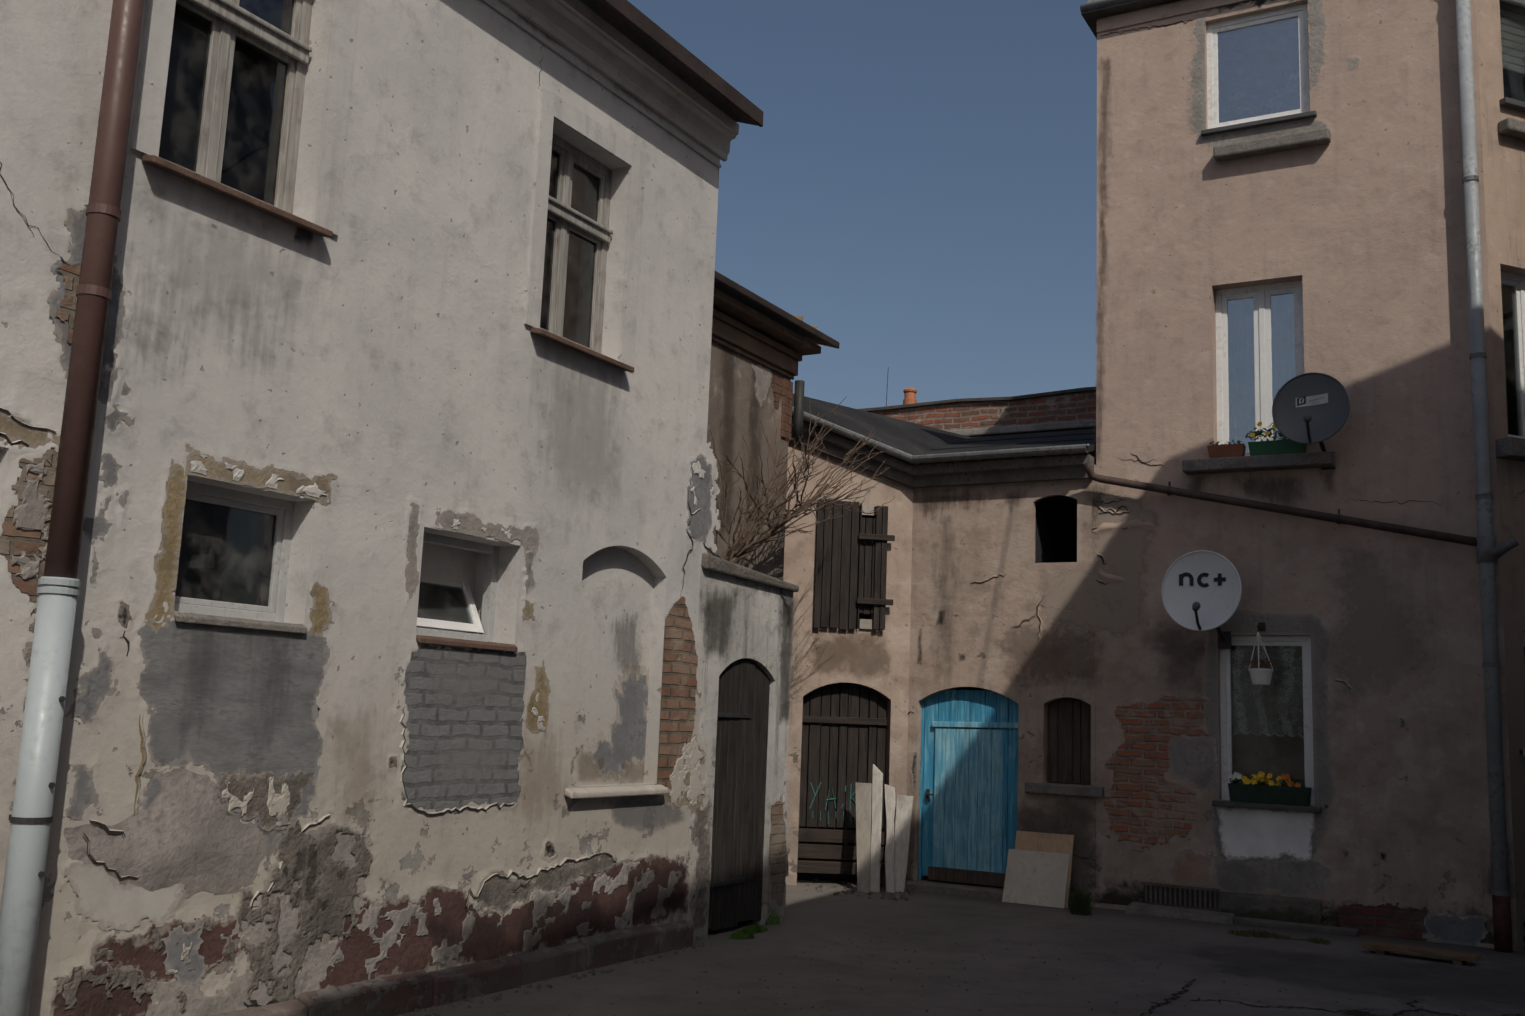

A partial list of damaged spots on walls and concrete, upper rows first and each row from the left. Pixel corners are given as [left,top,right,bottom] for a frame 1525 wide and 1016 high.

crack [0,162,69,265]
flaking render [0,171,92,908]
flaking render [78,194,150,591]
flaking render [138,432,344,637]
flaking render [398,492,548,627]
flaking render [677,436,721,562]
crack [971,573,1006,584]
crack [1011,498,1155,642]
crack [1119,453,1164,467]
peeling [29,582,713,1016]